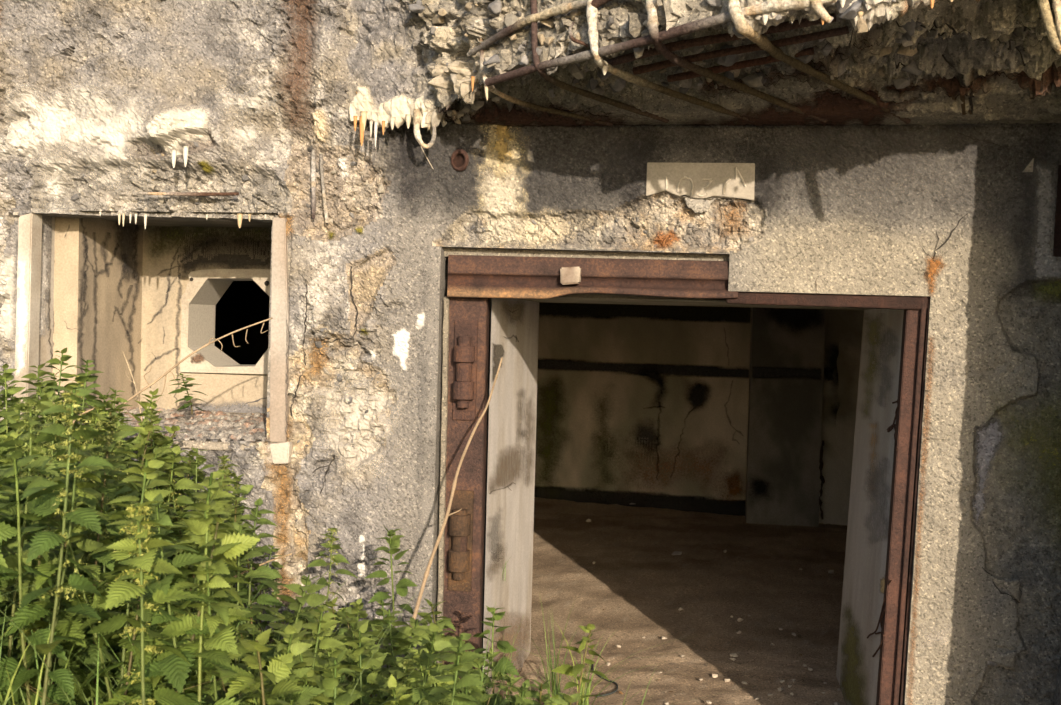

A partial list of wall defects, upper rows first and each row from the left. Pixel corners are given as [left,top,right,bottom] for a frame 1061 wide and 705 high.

rust [282,0,314,128]
leakage [428,51,496,104]
spalling [408,0,911,149]
leakage [728,0,889,39]
rust [690,62,1061,126]
spalling [0,127,391,264]
spalling [432,191,768,254]
rust [654,230,679,247]
leakage [349,86,1061,296]
crack [920,213,968,268]
spalling [256,247,399,608]
rust [268,461,293,596]